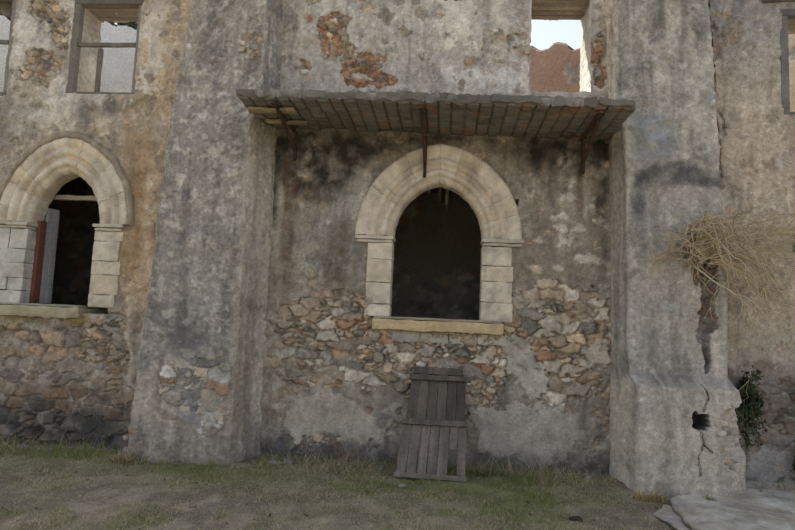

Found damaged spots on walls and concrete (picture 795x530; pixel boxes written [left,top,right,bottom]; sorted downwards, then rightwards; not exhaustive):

spalling [8,0,71,87]
peeling [60,0,168,109]
spalling [317,10,398,91]
peeling [441,0,531,94]
crack [708,0,726,190]
spalling [79,318,130,370]
spalling [159,354,232,438]
peeling [469,331,588,469]
peeling [576,337,612,371]
crack [692,261,720,477]
peeling [718,402,795,483]